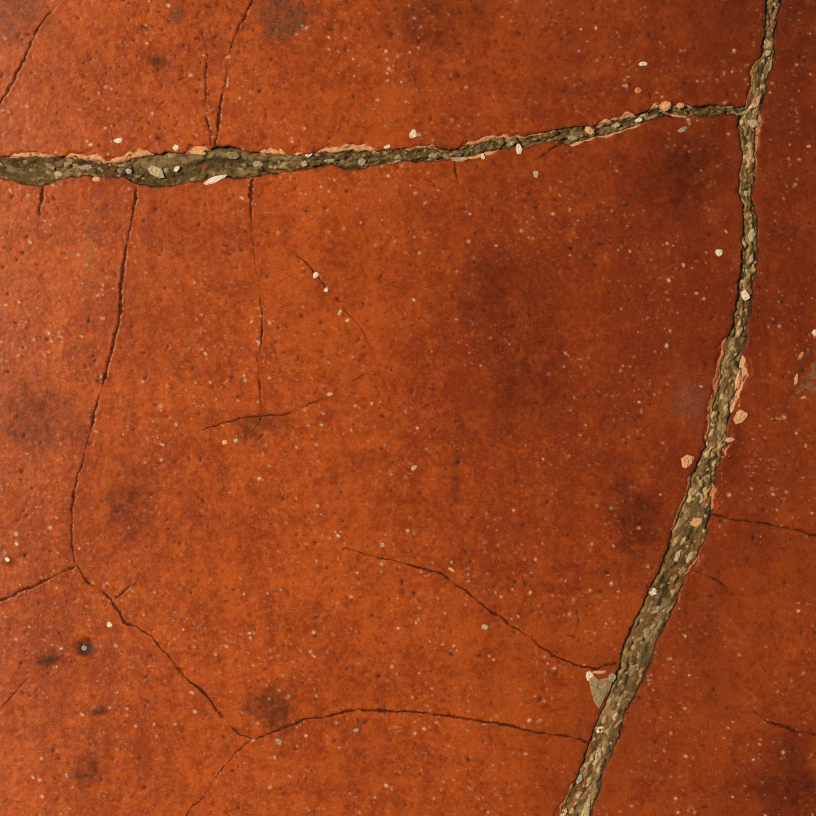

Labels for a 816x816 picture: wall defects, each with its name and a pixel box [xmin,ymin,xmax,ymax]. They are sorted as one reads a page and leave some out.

crack [0,12,51,104]
crack [0,93,748,212]
crack [247,179,255,221]
crack [88,189,138,437]
crack [296,255,328,292]
crack [202,298,333,445]
crack [559,0,781,816]
peeling [794,362,816,399]
crack [0,454,223,717]
crack [377,543,525,635]
crack [533,640,616,670]
crack [232,708,570,751]